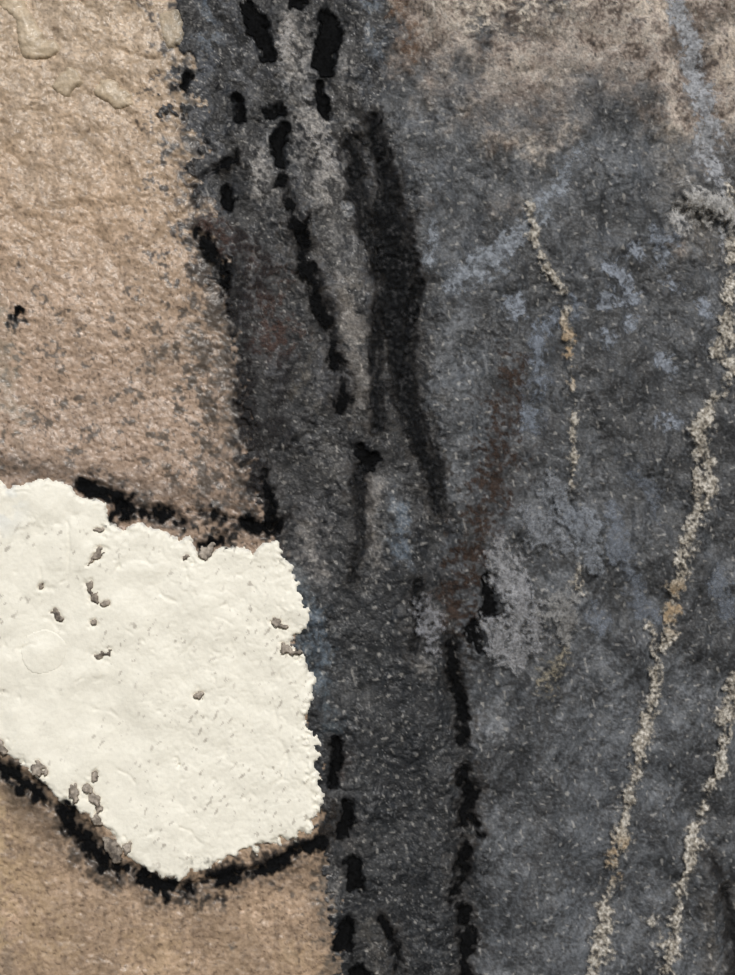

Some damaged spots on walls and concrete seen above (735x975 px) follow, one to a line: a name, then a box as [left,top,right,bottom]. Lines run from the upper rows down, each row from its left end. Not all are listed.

crack [201,147,240,176]
crack [193,227,234,291]
crack [273,109,448,517]
crack [75,467,284,553]
crack [347,464,372,583]
crack [408,576,487,975]
crack [377,914,407,973]